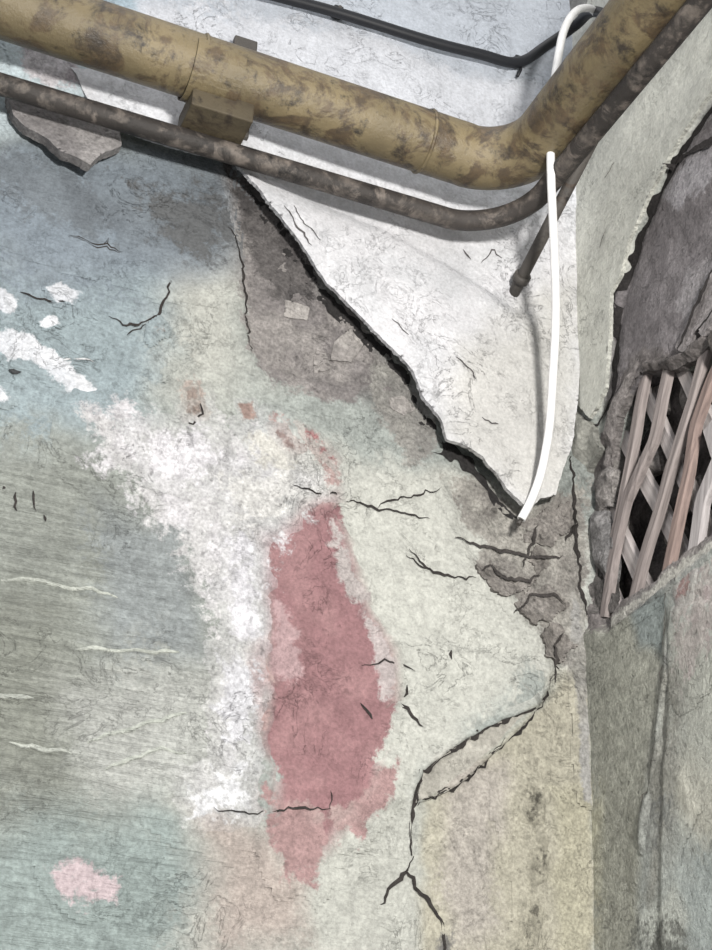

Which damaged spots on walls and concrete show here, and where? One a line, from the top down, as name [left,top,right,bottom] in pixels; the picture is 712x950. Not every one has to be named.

flaking render [431,9,712,717]
crack [677,270,712,350]
peeling [0,159,447,924]
crack [406,549,476,581]
crack [565,456,588,615]
crack [364,658,423,727]
crack [381,633,563,950]